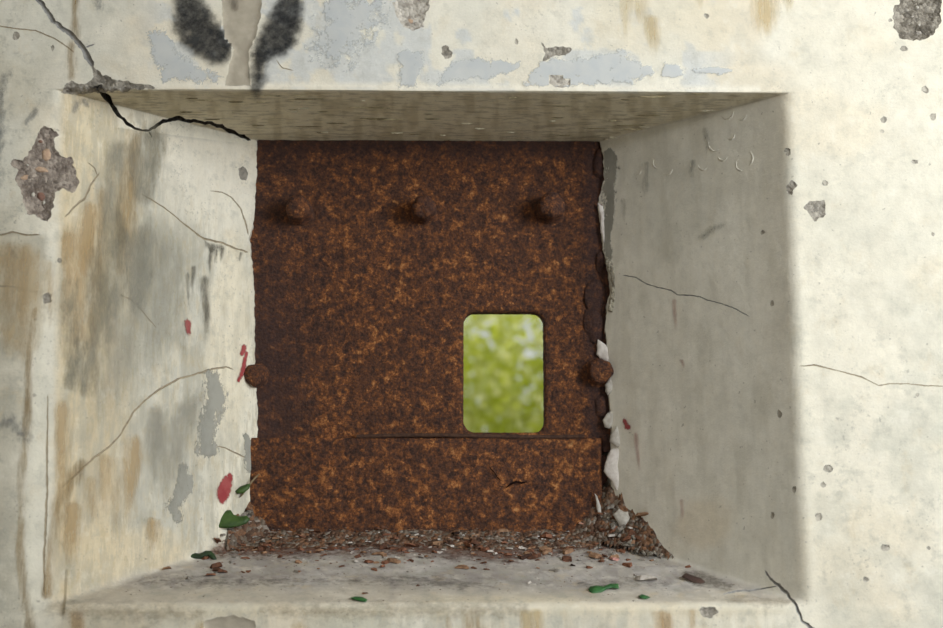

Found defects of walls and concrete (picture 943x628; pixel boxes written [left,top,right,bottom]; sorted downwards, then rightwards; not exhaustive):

spalling [392,0,430,31]
spalling [888,0,942,51]
crack [0,0,250,141]
spalling [10,126,79,221]
crack [0,229,40,237]
leakage [192,267,208,320]
crack [623,275,750,317]
crack [801,364,943,387]
crack [43,366,234,592]
crack [724,571,815,628]